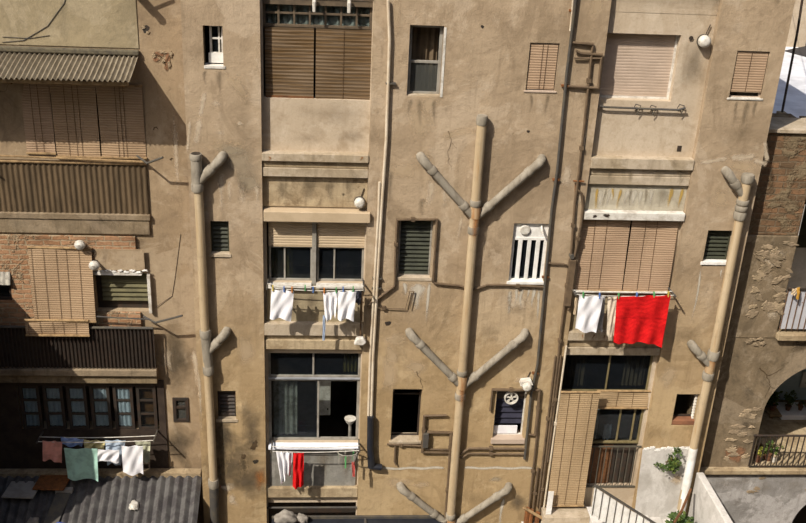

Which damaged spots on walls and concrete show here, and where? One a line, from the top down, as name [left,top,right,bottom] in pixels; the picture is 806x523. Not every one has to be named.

spalling [152,50,173,70]
peeling [745,241,799,319]
spalling [723,407,762,462]